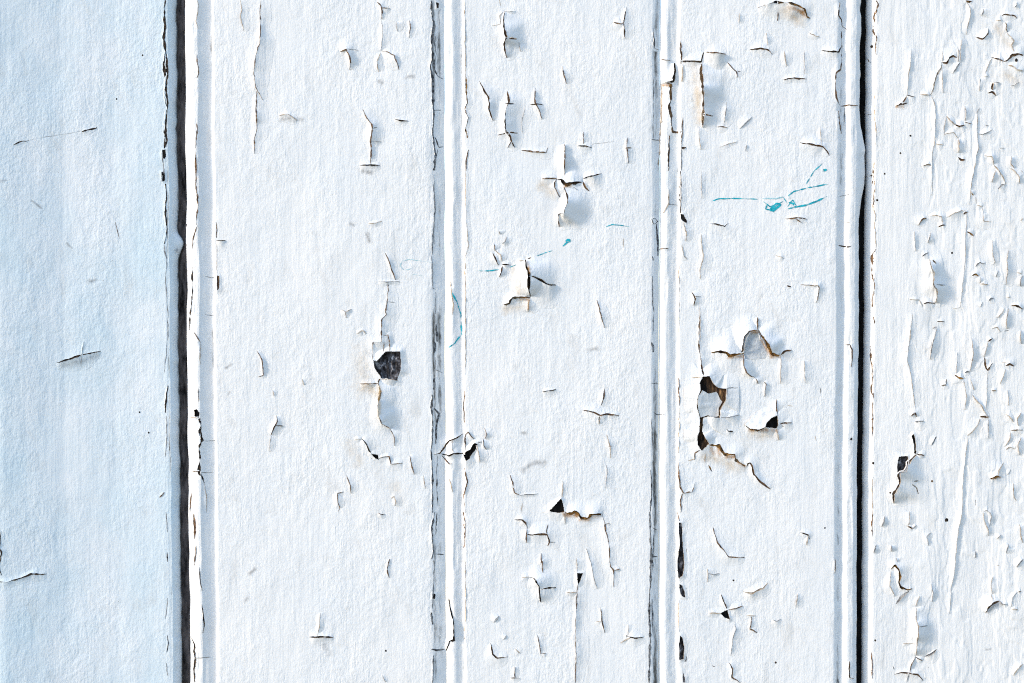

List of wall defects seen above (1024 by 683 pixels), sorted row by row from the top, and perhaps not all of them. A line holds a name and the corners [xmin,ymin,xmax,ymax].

crack [240,0,298,154]
peeling [497,89,531,152]
peeling [540,142,604,230]
peeling [739,0,858,157]
peeling [486,229,561,314]
peeling [354,344,422,475]
peeling [434,427,494,492]
peeling [684,313,814,492]
peeling [844,343,855,367]
peeling [871,0,1024,683]
peeling [506,474,621,683]
peeling [708,579,771,656]